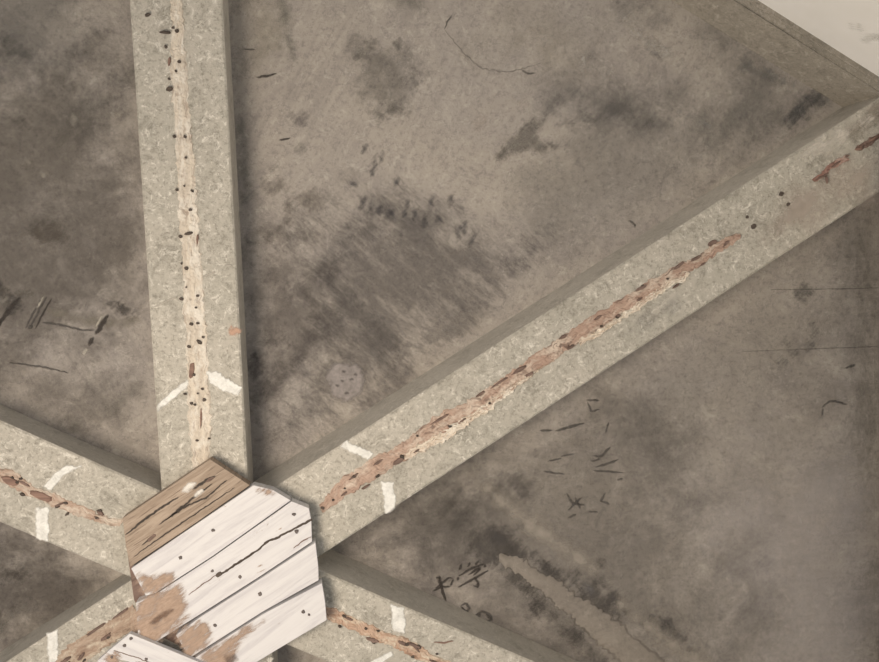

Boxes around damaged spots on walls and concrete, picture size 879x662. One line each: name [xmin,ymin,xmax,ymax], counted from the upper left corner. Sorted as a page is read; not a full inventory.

spalling [159,0,213,468]
spalling [319,233,741,513]